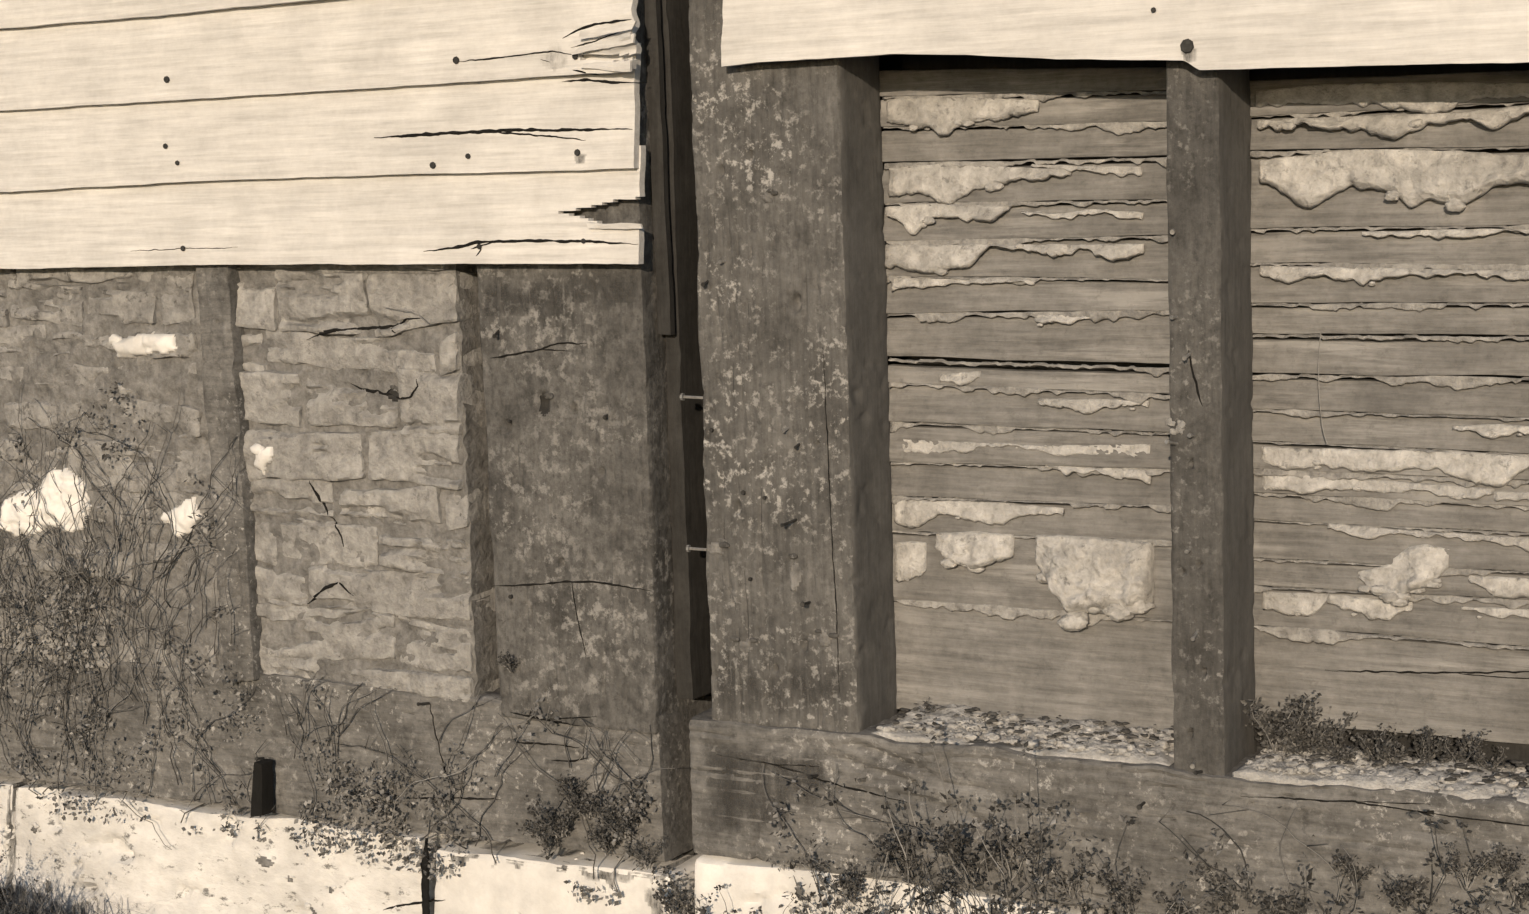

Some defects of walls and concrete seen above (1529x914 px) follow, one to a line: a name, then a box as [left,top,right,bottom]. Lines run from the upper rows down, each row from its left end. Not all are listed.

crack [459,19,646,84]
crack [374,128,632,141]
peeling [1445,199,1467,212]
crack [423,239,637,256]